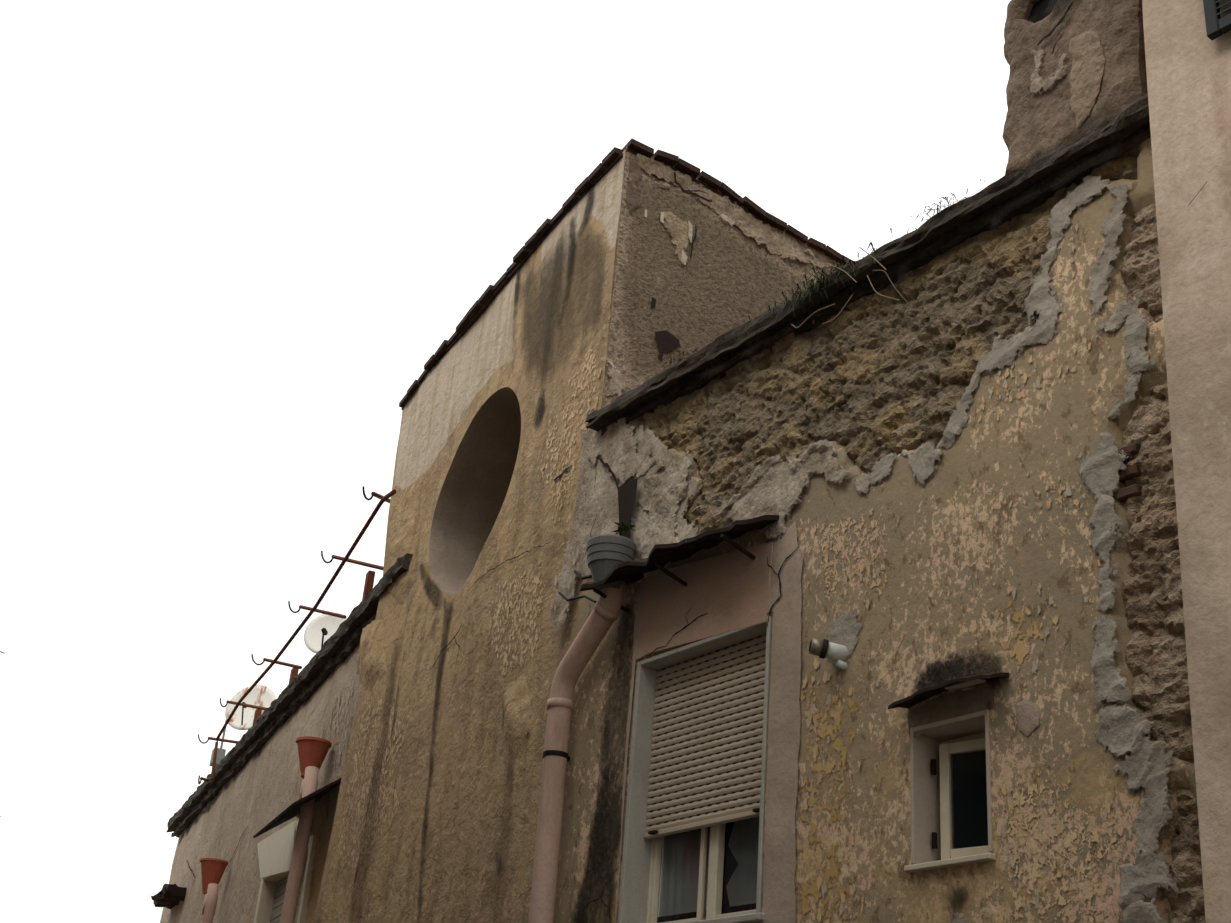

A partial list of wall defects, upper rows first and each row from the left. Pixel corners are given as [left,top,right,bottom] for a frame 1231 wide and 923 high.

flaking render [627,155,697,266]
crack [674,172,712,202]
water stain [513,184,601,367]
water stain [534,391,544,426]
peeling [978,355,1042,429]
flaking render [483,342,700,692]
peeling [991,447,1094,525]
crack [766,546,799,627]
water stain [420,565,452,866]